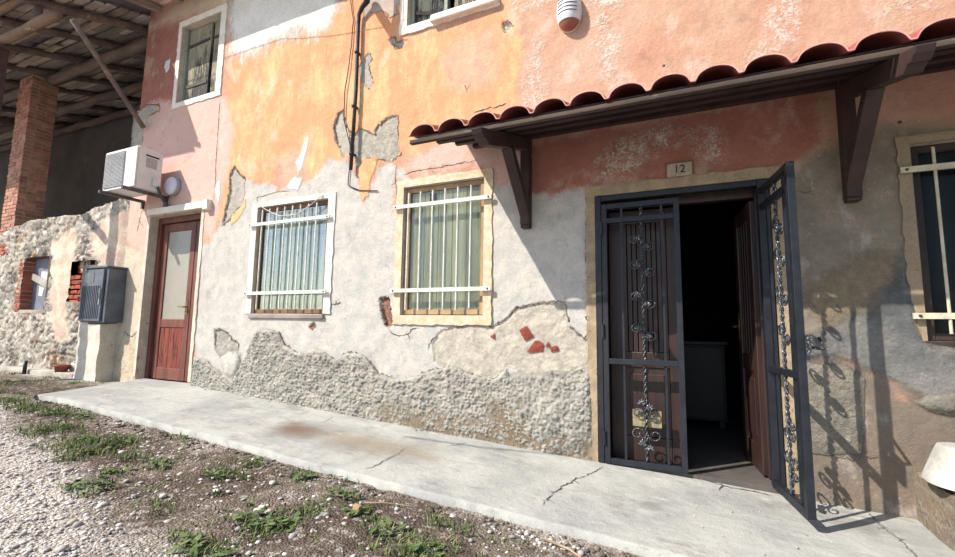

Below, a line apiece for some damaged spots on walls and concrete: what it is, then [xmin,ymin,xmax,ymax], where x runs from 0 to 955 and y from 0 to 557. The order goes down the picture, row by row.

flaking render [363,0,400,20]
flaking render [359,52,373,89]
flaking render [332,108,401,200]
flaking render [222,166,246,227]
flaking render [190,296,594,461]
crack [542,467,602,506]
crack [869,513,918,557]